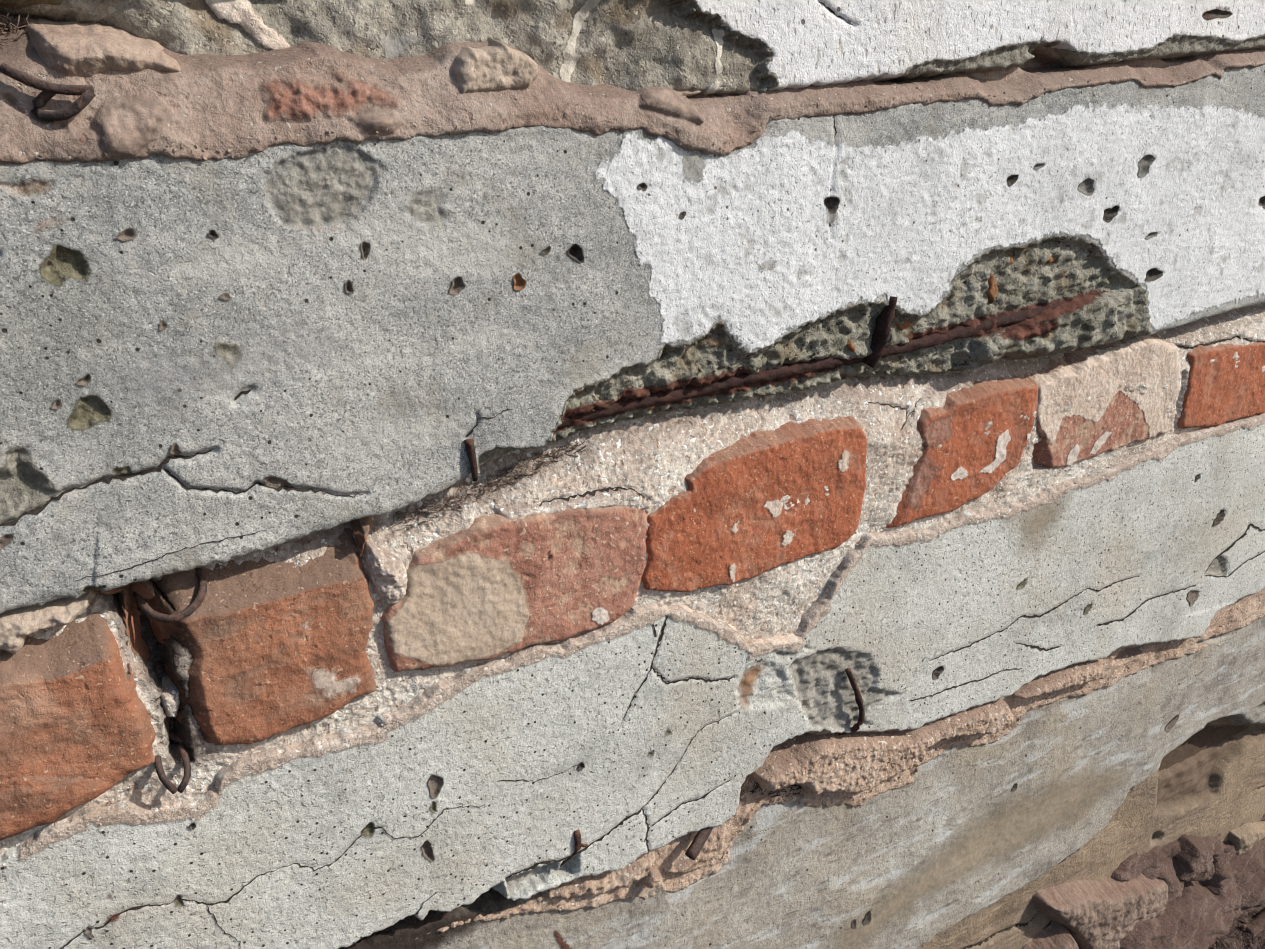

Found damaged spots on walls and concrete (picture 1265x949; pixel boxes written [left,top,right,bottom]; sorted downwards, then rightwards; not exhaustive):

spalling [885,34,1265,82]
peeling [545,103,1265,447]
rust [893,274,1104,341]
rust [551,339,856,442]
crack [0,449,365,526]
spalling [477,447,529,474]
crack [75,530,266,581]
crack [910,523,1265,701]
crack [620,608,735,727]
crack [499,712,737,878]
spalling [1157,703,1265,804]
crack [60,805,481,949]